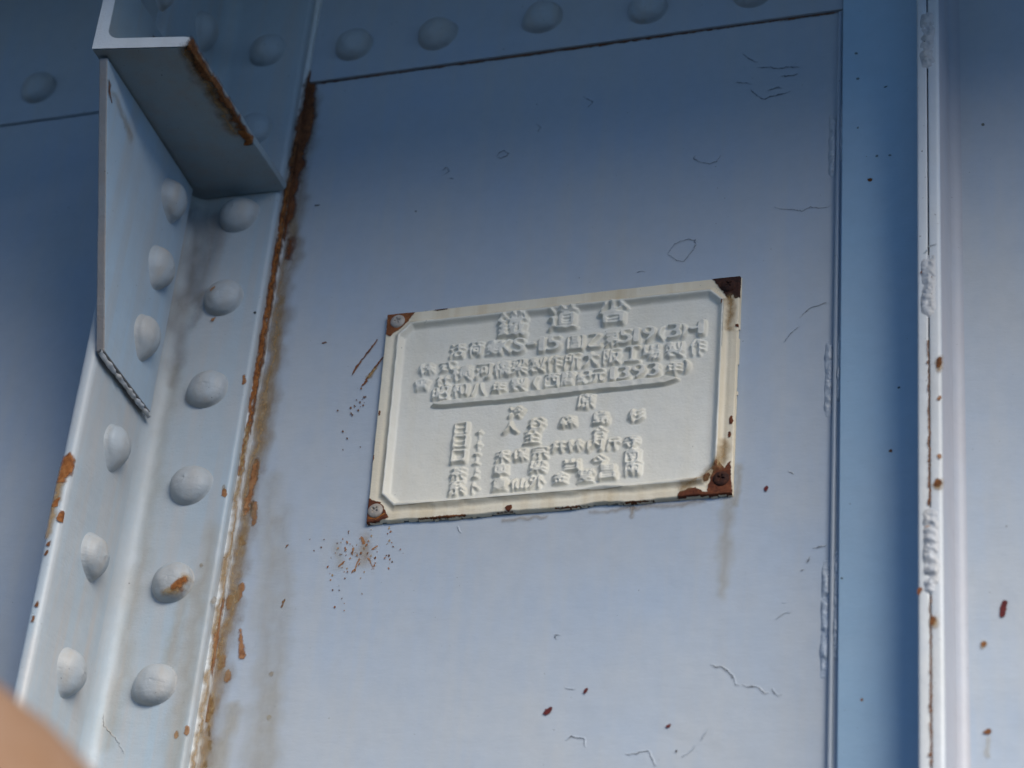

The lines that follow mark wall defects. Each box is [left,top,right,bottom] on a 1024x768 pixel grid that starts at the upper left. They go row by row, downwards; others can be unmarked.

rust [174,12,835,768]
rust [44,452,76,555]
rust [162,575,188,594]